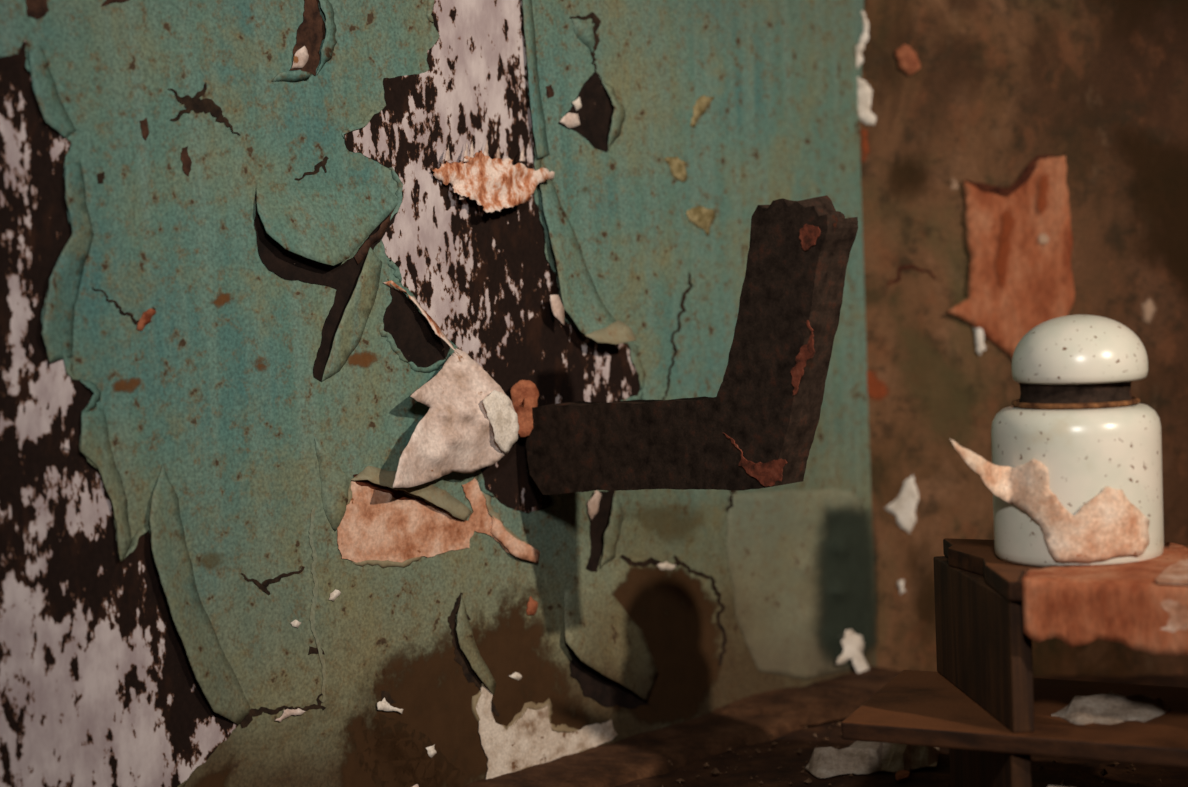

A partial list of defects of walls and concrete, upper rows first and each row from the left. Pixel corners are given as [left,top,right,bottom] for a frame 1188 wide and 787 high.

crack [168,82,240,135]
peeling [0,40,251,787]
peeling [254,0,645,572]
crack [662,273,693,400]
rust [867,371,888,399]
rust [996,206,1016,286]
crack [241,566,305,595]
crack [621,555,727,666]
peeling [456,586,659,779]